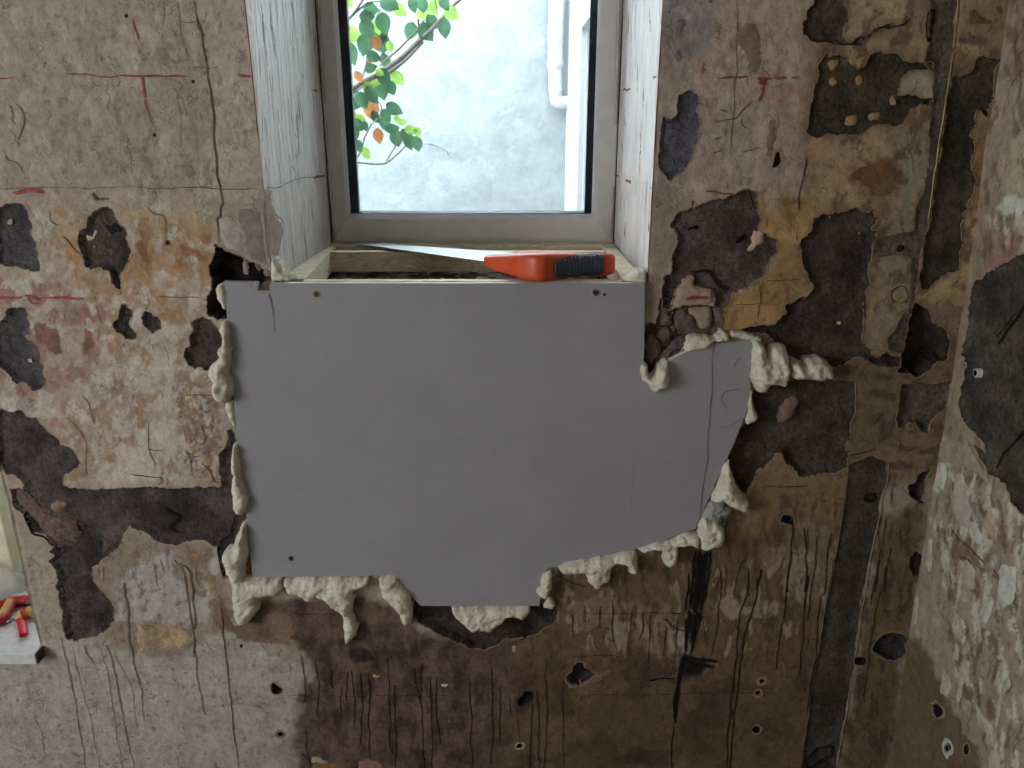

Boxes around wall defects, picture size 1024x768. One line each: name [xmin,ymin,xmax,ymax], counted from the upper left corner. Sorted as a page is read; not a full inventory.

crack [181,0,223,244]
flaking render [0,202,40,273]
flaking render [0,306,46,392]
flaking render [77,206,133,290]
flaking render [112,303,162,340]
flaking render [183,188,283,371]
flaking render [644,0,1024,546]
flaking render [0,408,247,642]
damp [209,597,548,768]
flaking render [412,597,559,652]
damp [649,549,762,768]
damp [776,494,832,710]